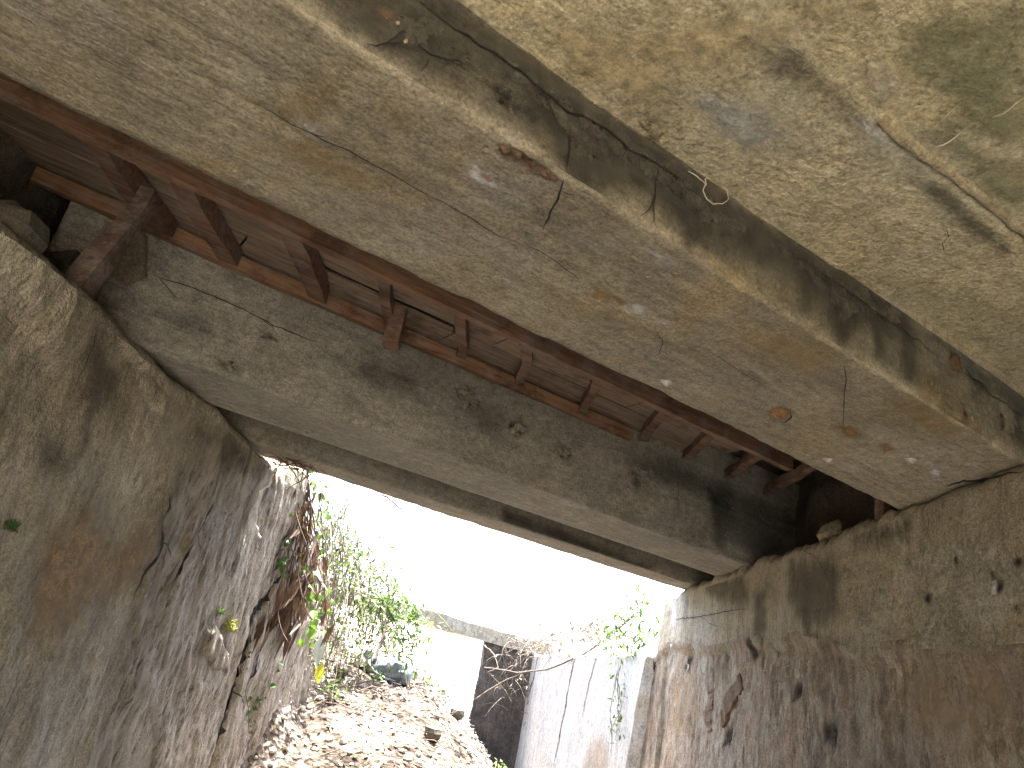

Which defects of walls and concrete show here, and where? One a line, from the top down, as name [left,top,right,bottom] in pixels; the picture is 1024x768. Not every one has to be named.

crack [152,274,320,343]
crack [256,1,718,277]
water stain [476,22,914,372]
crack [841,365,849,430]
water stain [930,189,1004,248]
crack [132,420,215,603]
crack [196,530,292,768]
crack [672,608,748,626]
water stain [791,563,837,634]
spalling [639,541,1024,768]